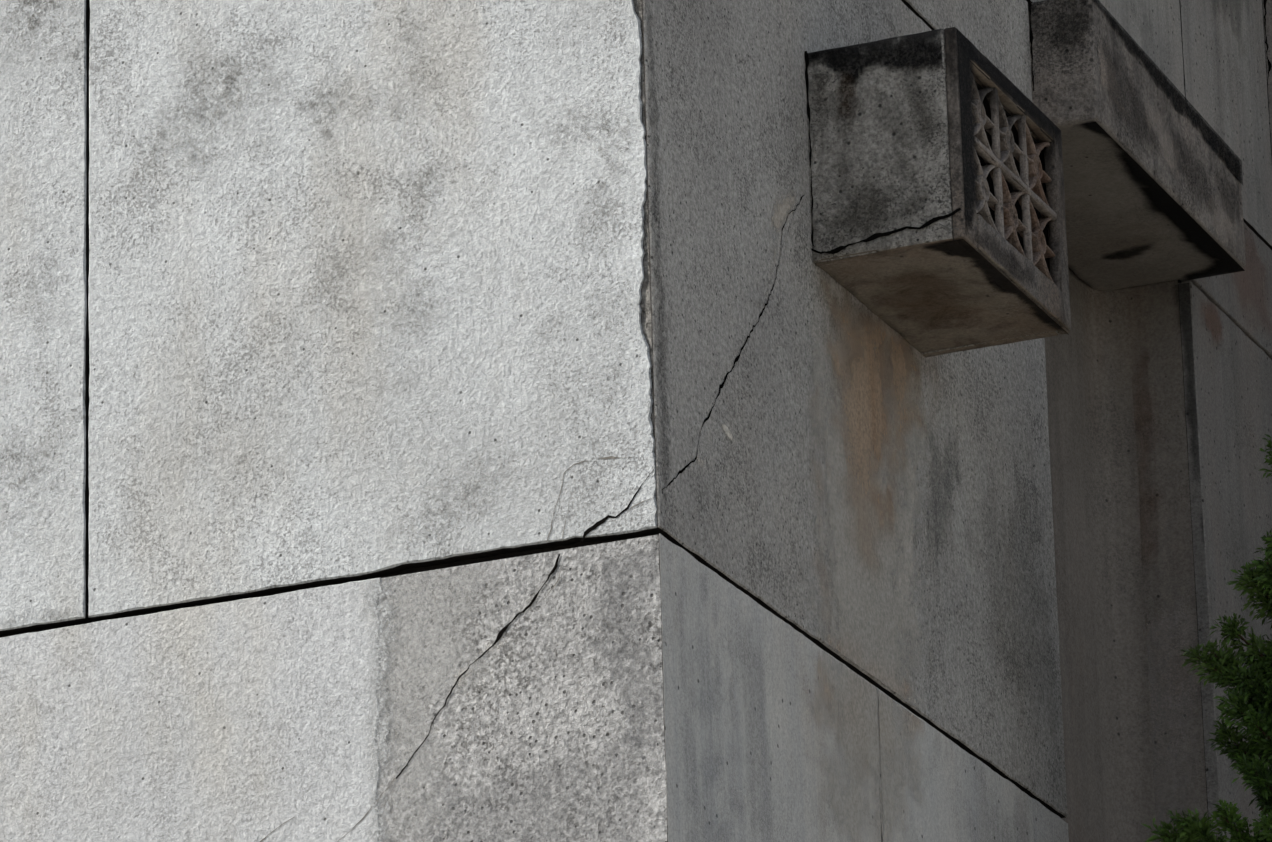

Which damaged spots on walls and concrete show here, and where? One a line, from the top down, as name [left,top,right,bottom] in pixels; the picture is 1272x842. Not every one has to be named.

water stain [809,39,943,122]
water stain [924,29,1068,334]
water stain [1031,0,1243,185]
water stain [1081,121,1245,431]
crack [338,51,961,841]